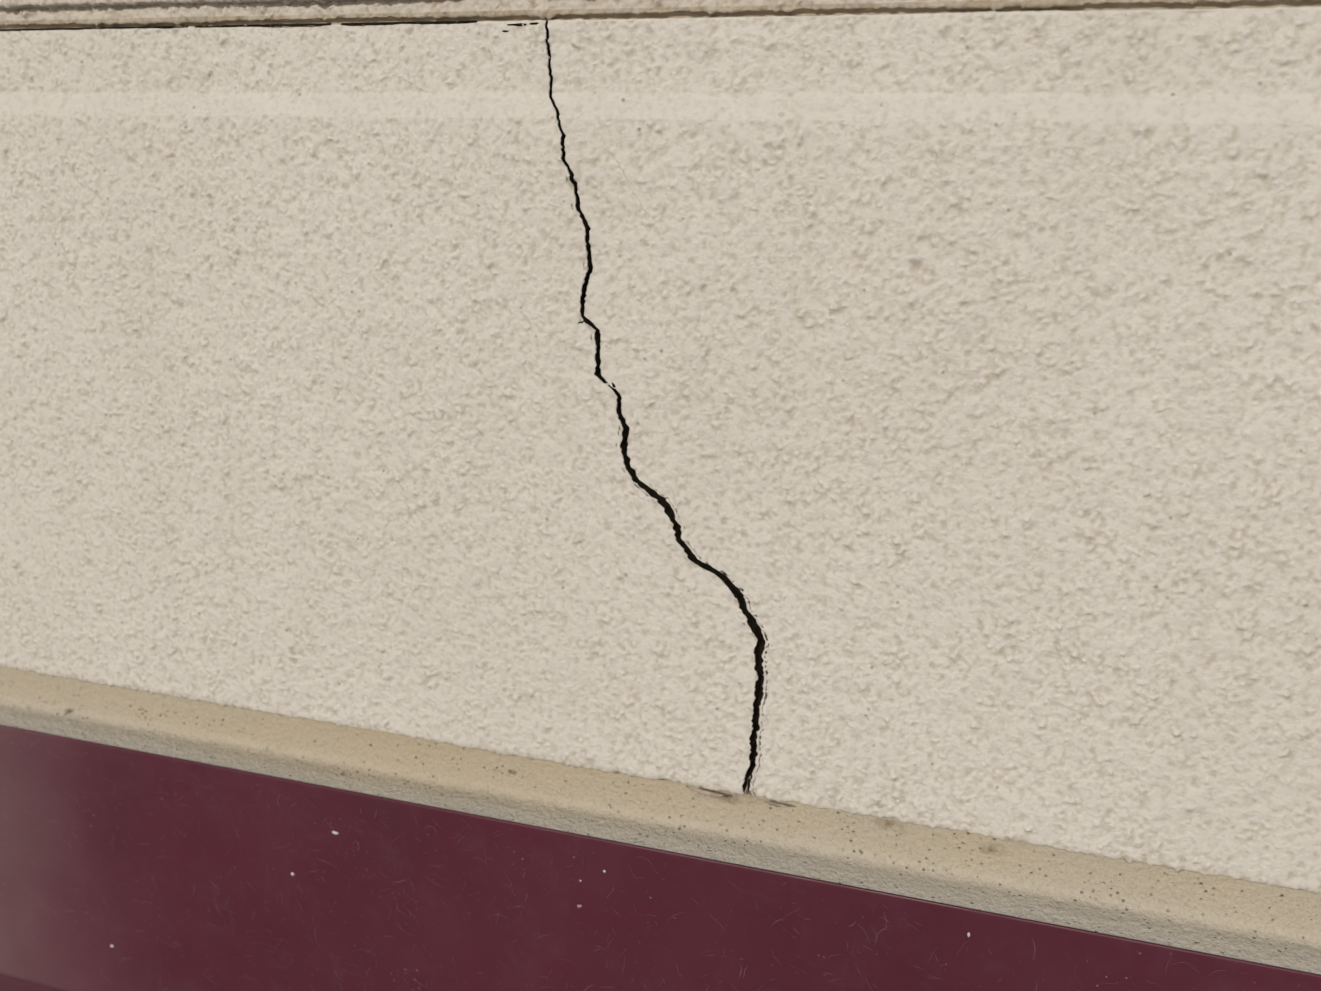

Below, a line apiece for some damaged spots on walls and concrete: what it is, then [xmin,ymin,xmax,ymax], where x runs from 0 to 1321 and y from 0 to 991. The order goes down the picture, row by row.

crack [545,21,766,793]